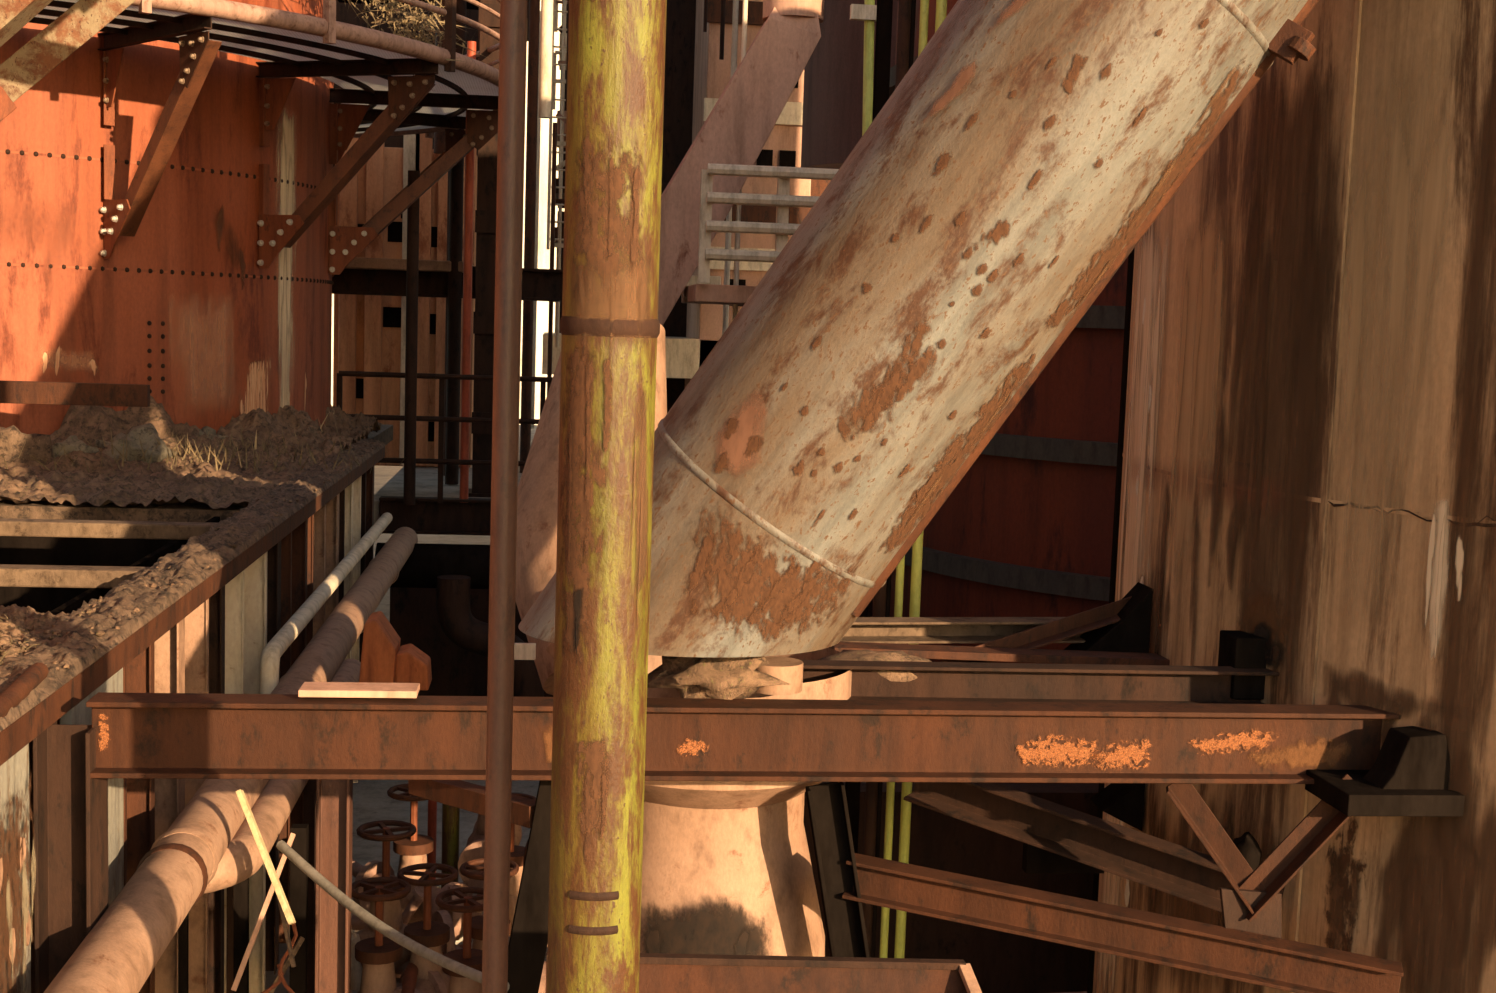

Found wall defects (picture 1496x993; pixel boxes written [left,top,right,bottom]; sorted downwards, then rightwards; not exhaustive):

peeling [1118,223,1167,600]
leakage [1425,113,1496,791]
crack [1328,501,1496,527]
peeling [573,588,583,668]
peeling [1106,814,1128,827]
peeling [1102,871,1130,907]